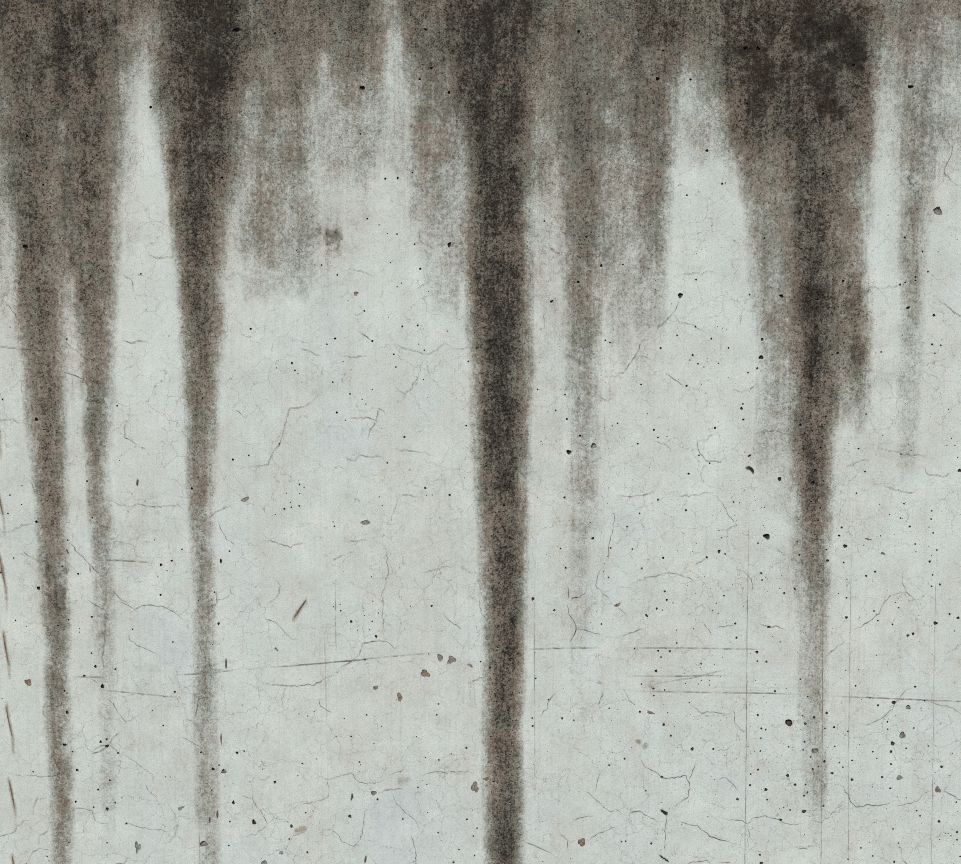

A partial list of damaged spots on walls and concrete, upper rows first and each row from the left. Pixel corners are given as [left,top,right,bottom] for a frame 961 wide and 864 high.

water stain [325,228,342,245]
water stain [197,740,216,825]